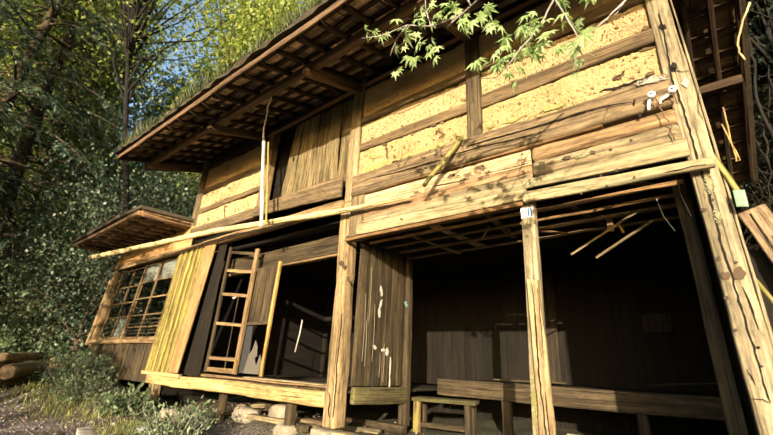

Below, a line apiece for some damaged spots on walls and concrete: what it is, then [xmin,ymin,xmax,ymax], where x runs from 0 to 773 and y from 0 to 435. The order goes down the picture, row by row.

crack [433,163,528,187]
crack [378,70,650,177]
spalling [481,2,649,90]
spalling [483,46,656,131]
crack [658,13,771,403]
crack [531,281,550,435]